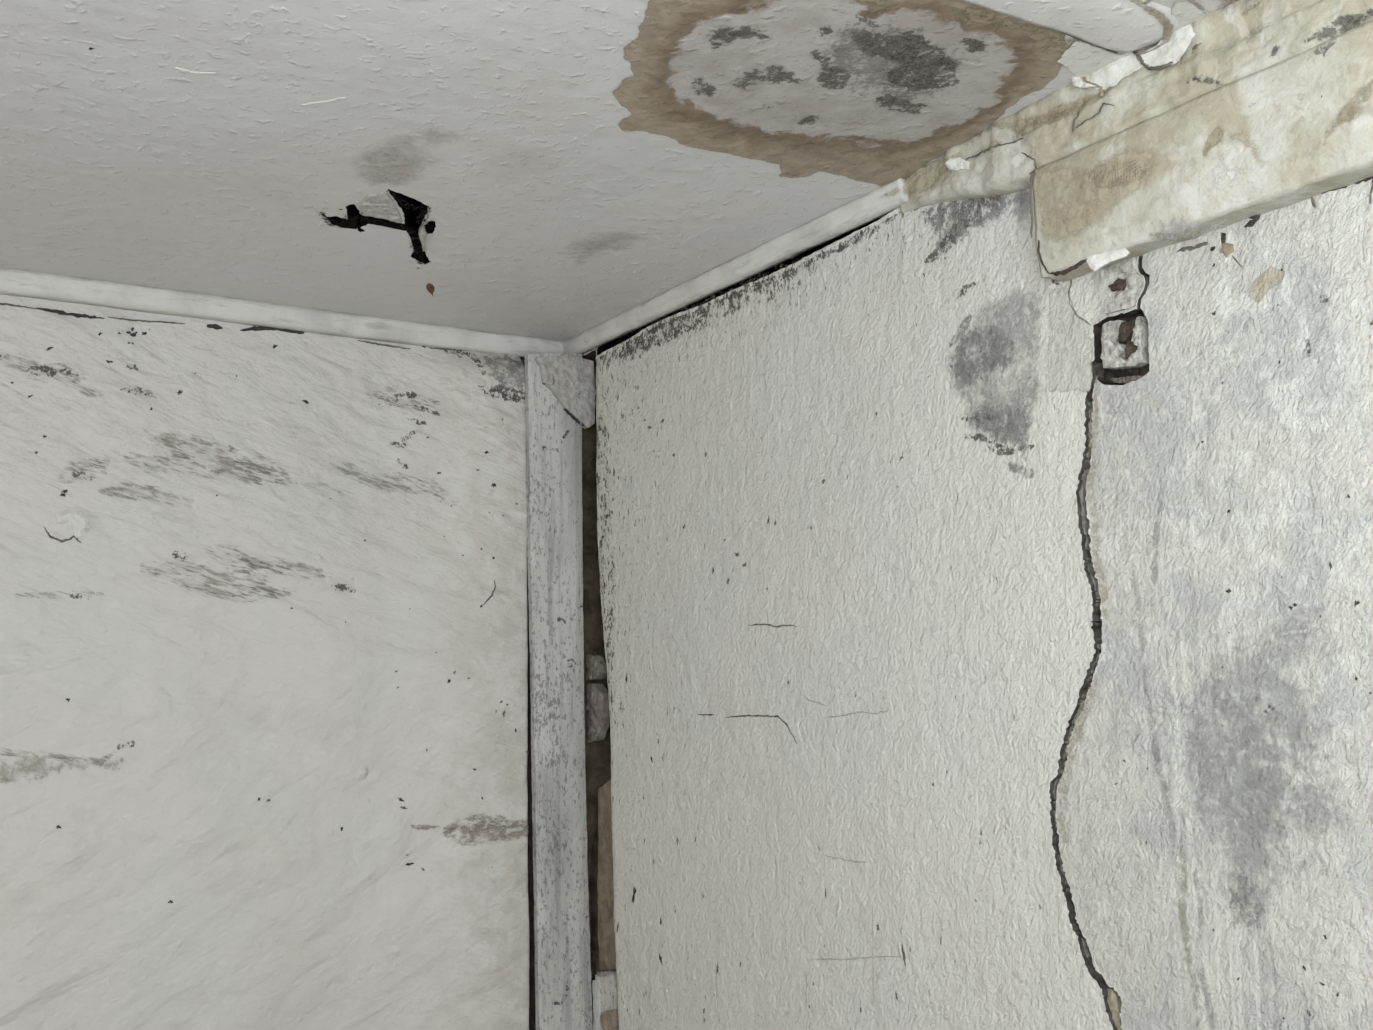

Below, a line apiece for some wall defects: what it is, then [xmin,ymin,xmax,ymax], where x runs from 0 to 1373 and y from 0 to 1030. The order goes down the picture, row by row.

peeling [1057,1,1205,97]
leakage [613,0,1104,195]
peeling [945,157,970,171]
crack [1072,103,1114,131]
leakage [595,214,897,371]
crack [966,138,1150,326]
crack [1177,242,1208,252]
peeling [1210,232,1242,267]
crack [1244,214,1261,228]
crack [1311,176,1373,262]
leakage [950,296,1038,478]
crack [1049,361,1122,1030]